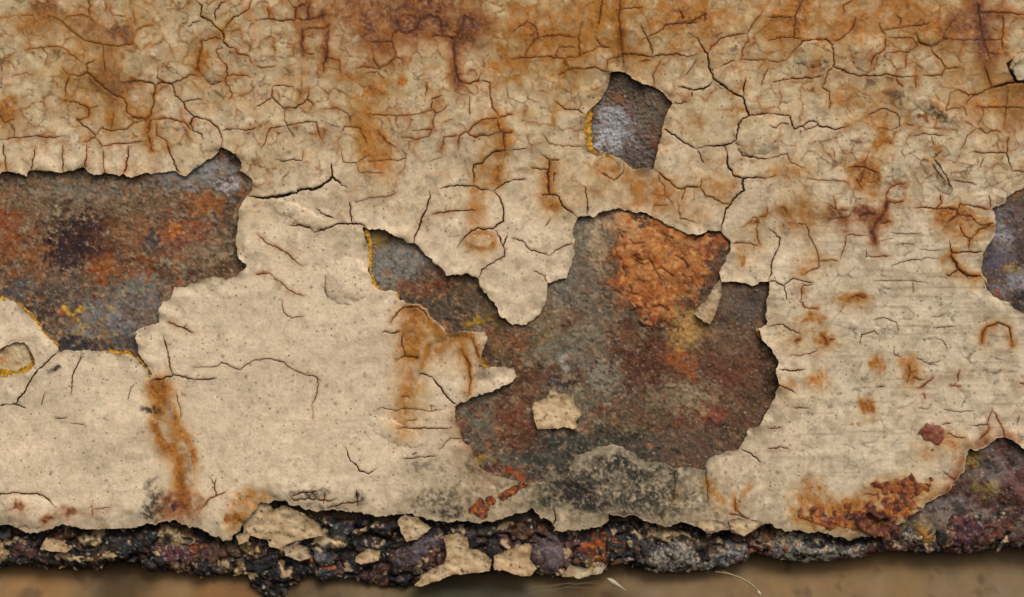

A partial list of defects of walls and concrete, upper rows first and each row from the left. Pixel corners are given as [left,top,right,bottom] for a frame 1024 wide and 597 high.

peeling [0,147,253,378]
crack [256,234,303,318]
crack [0,1,624,281]
rust [401,305,480,413]
rust [294,0,647,173]
peeling [363,208,779,483]
peeling [584,71,672,169]
crack [513,0,1024,408]
rust [808,371,824,386]
crack [860,317,1020,441]
peeling [981,186,1024,313]
rust [0,374,1024,597]